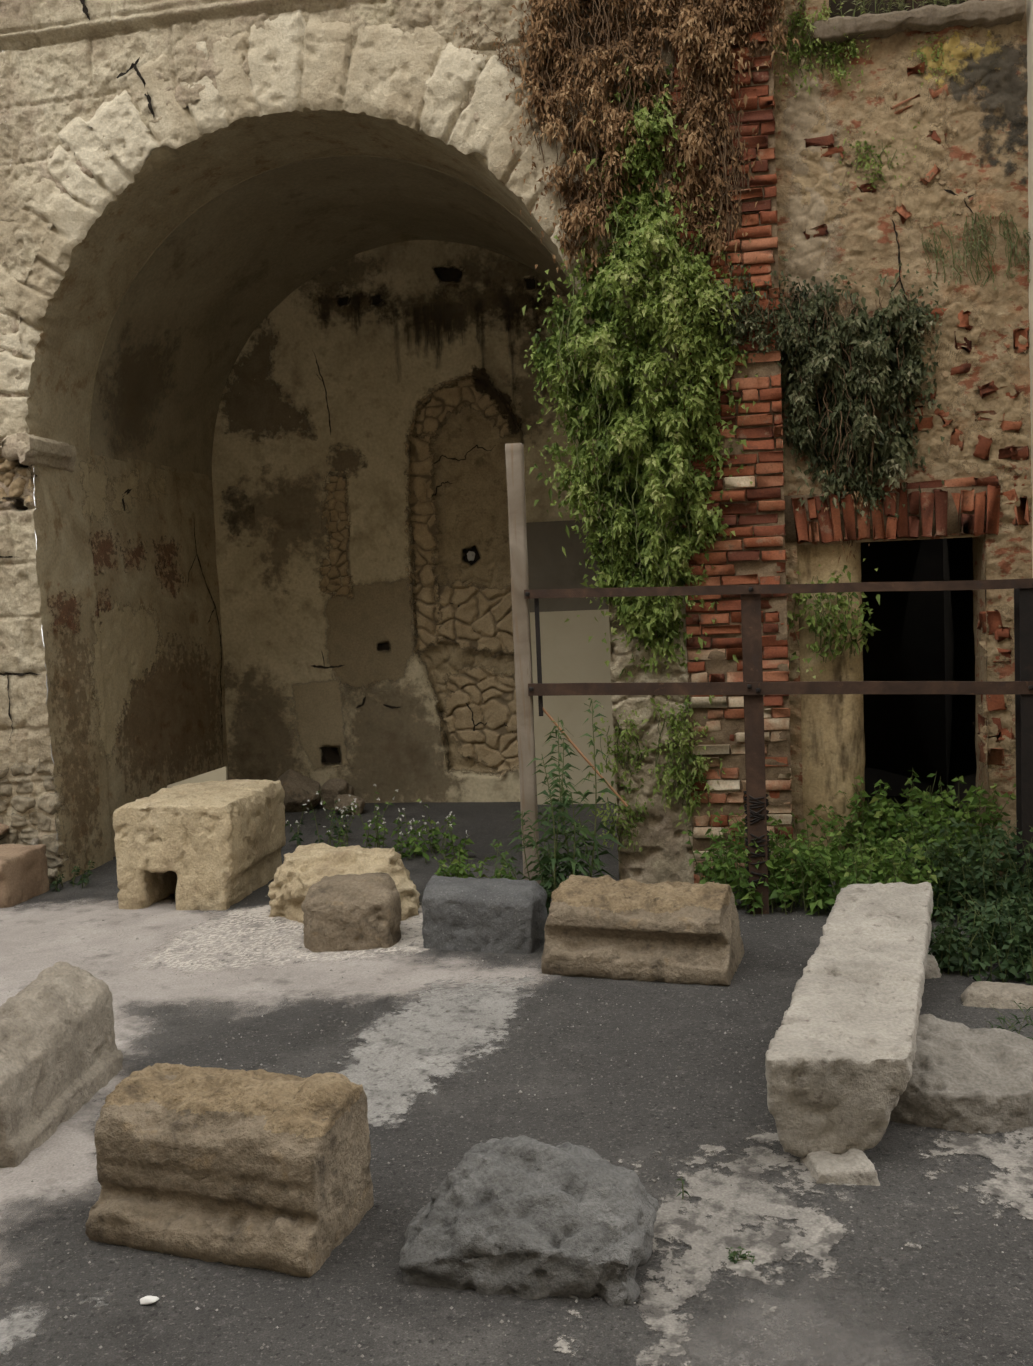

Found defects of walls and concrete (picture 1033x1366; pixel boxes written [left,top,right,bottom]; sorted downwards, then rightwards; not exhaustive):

spalling [782,54,977,312]
water stain [301,247,565,436]
spalling [471,366,522,434]
spalling [886,292,1032,529]
water stain [224,470,332,592]
spalling [462,545,480,565]